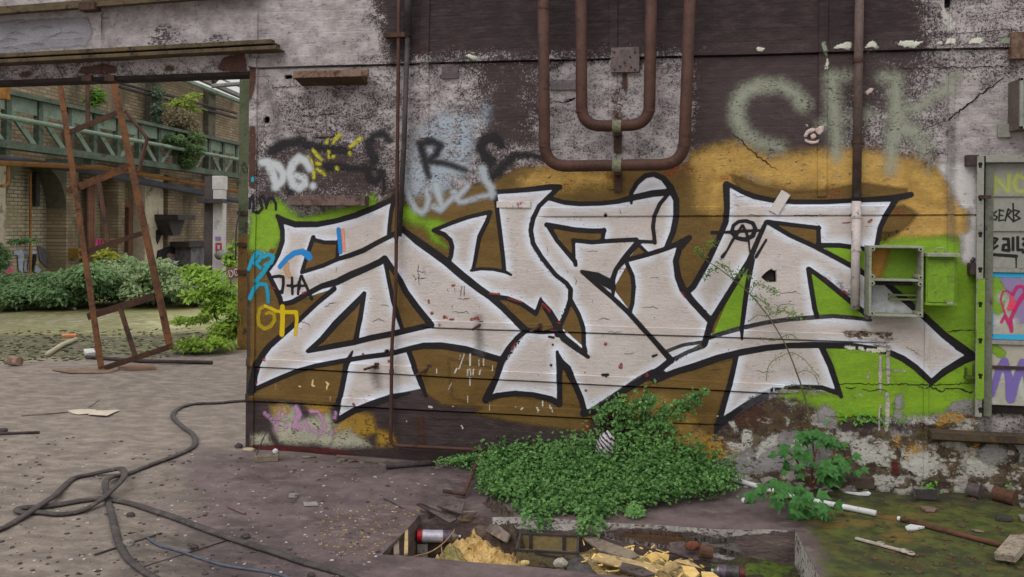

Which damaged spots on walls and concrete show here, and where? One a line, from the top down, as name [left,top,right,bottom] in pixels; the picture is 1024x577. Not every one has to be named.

peeling [822,41,852,69]
peeling [898,40,923,48]
crack [901,64,1011,136]
peeling [694,417,834,475]
peeling [817,404,837,427]
peeling [849,399,1024,486]